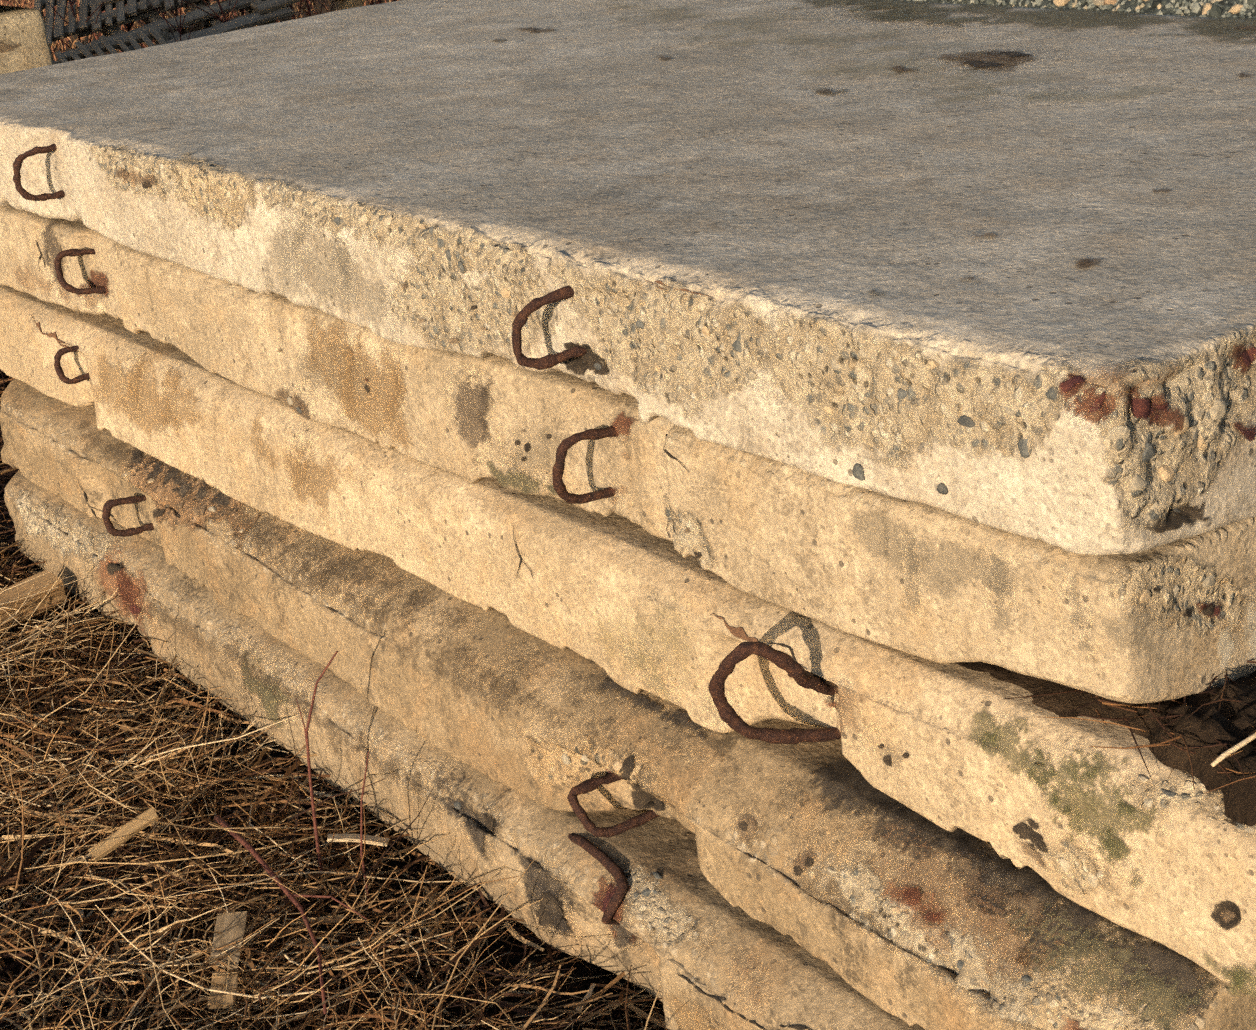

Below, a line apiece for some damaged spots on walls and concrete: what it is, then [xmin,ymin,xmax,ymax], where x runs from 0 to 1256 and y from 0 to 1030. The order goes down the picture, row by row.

corrosion [79,270,108,298]
corrosion [1229,343,1256,374]
corrosion [611,412,635,437]
spalling [548,261,1256,530]
corrosion [1059,374,1185,431]
corrosion [1234,423,1256,442]
corrosion [96,549,152,633]
corrosion [592,877,636,948]
corrosion [884,882,944,929]